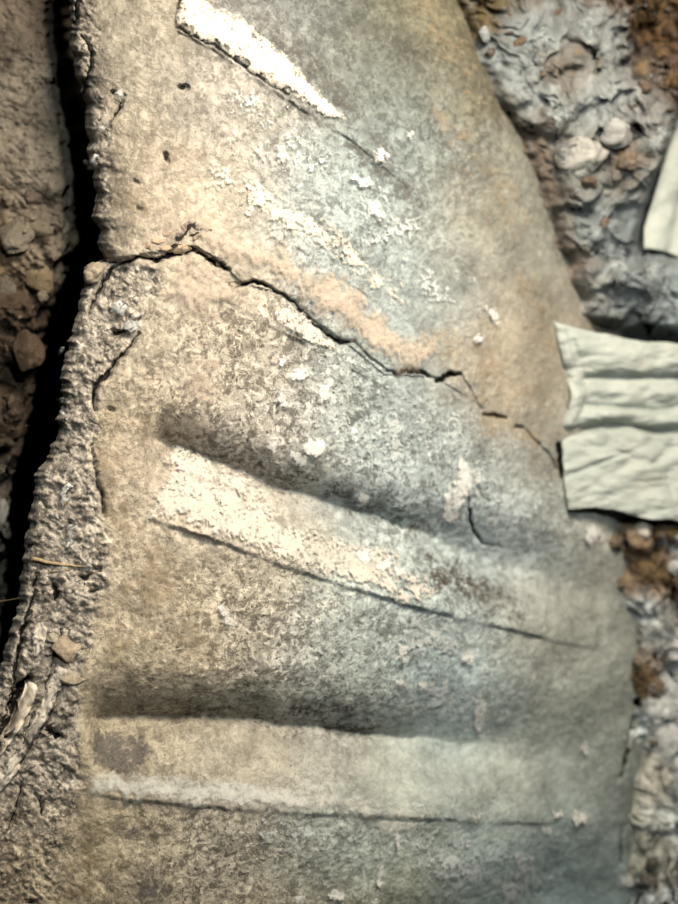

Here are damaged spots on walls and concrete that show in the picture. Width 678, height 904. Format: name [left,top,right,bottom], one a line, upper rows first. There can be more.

peeling [176,0,344,118]
crack [89,247,556,468]